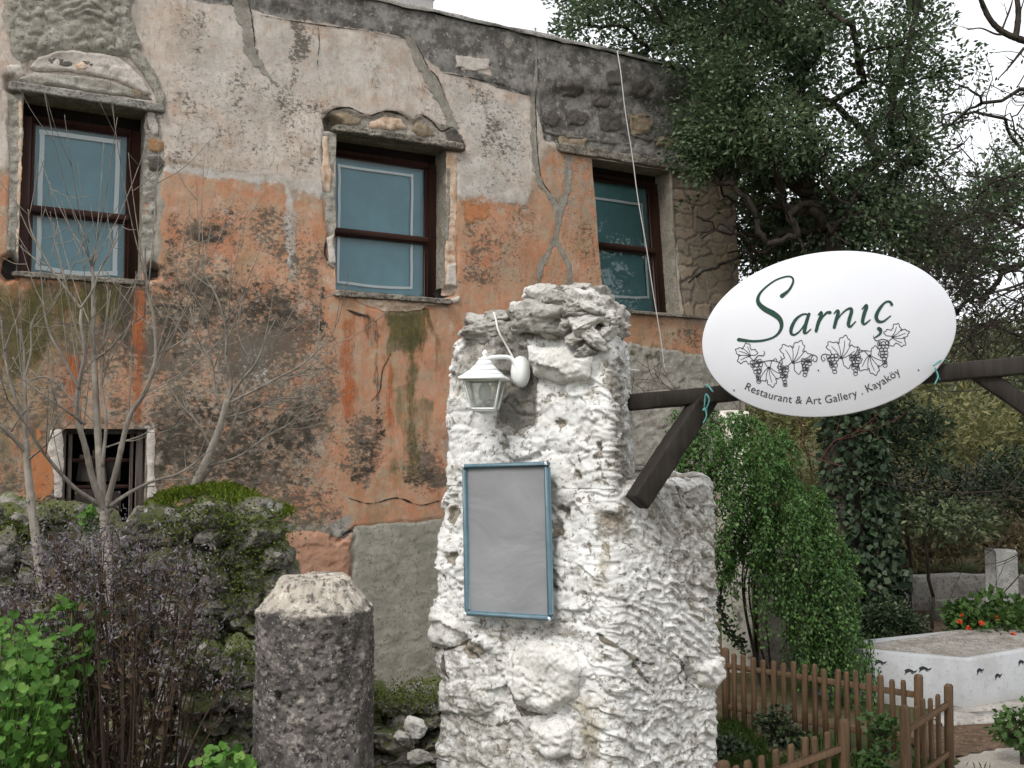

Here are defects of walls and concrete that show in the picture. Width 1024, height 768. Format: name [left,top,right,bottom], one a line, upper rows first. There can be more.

crack [232,0,574,285]
flaking render [543,70,691,155]
water stain [186,209,238,248]
water stain [147,238,329,358]
crack [372,354,391,401]
water stain [409,348,418,415]
water stain [351,368,387,482]
crack [342,497,440,538]